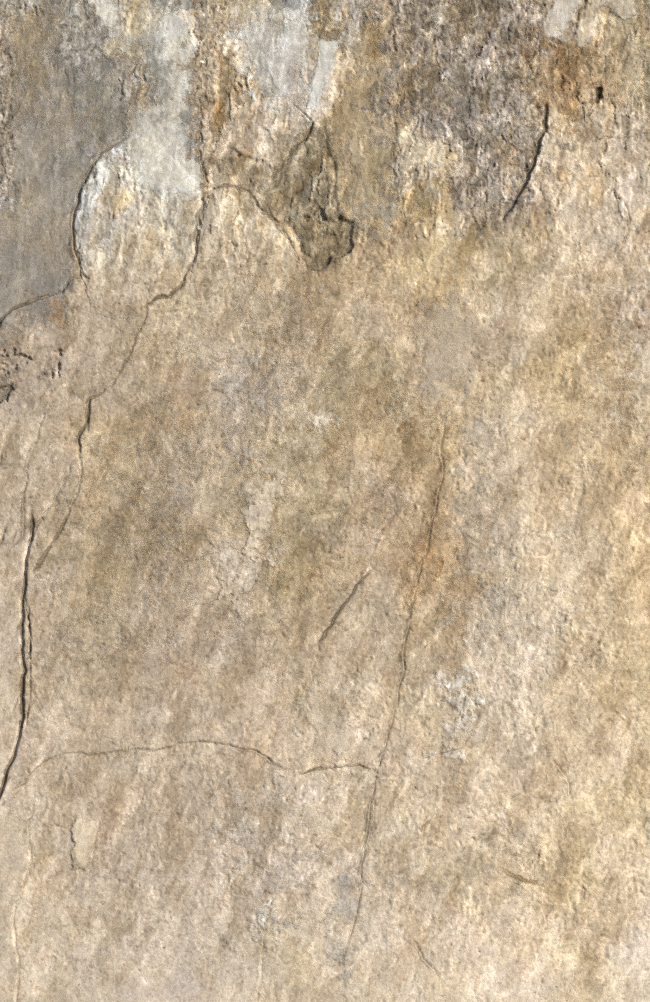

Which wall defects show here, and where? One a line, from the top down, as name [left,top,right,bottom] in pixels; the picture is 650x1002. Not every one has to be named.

crack [71,142,120,259]
crack [0,292,62,321]
crack [76,393,101,447]
crack [0,494,65,798]
crack [398,569,421,694]
crack [358,796,372,904]